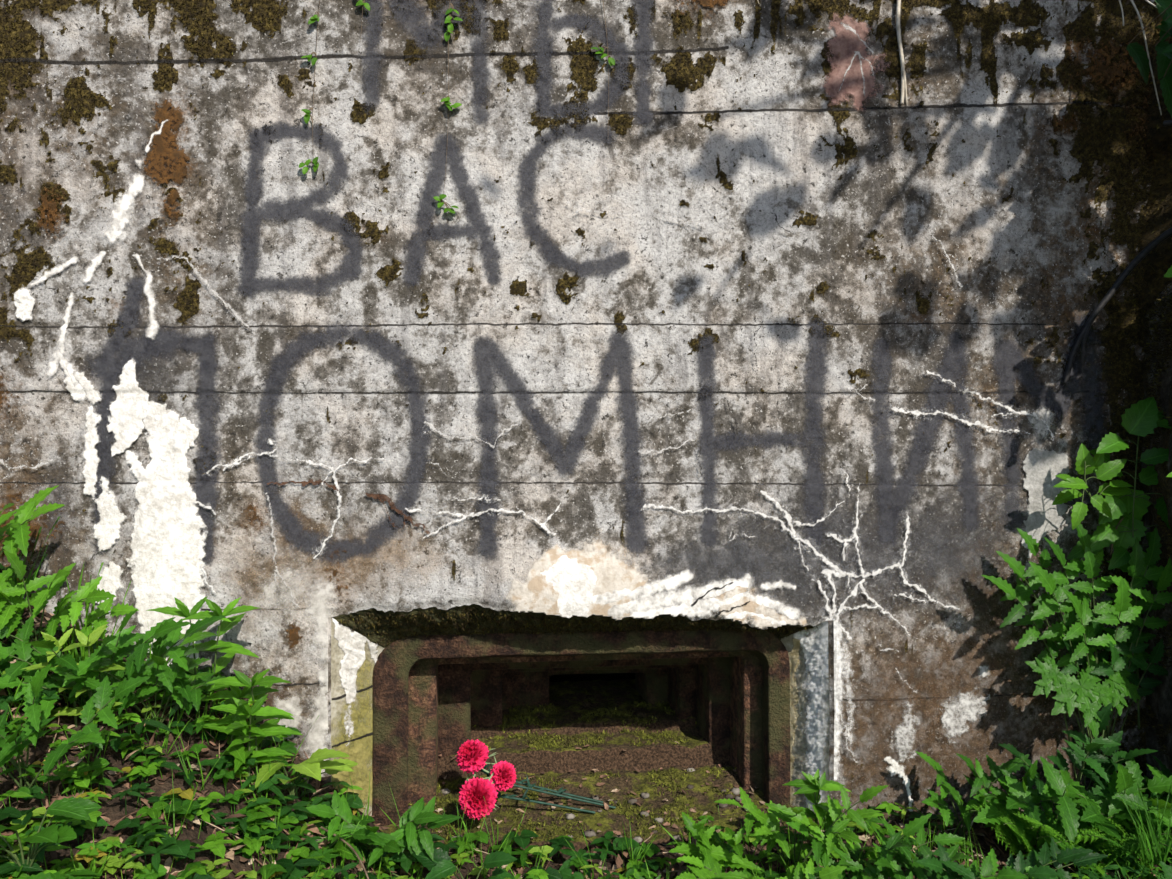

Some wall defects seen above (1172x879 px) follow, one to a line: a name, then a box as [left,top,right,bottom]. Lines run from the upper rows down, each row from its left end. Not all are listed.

rust [143,99,190,238]
crack [424,421,521,448]
crack [639,409,702,476]
crack [844,370,1054,437]
crack [206,439,563,607]
crack [200,566,217,595]
spalling [506,540,806,629]
crack [643,472,960,693]
crack [840,711,858,763]